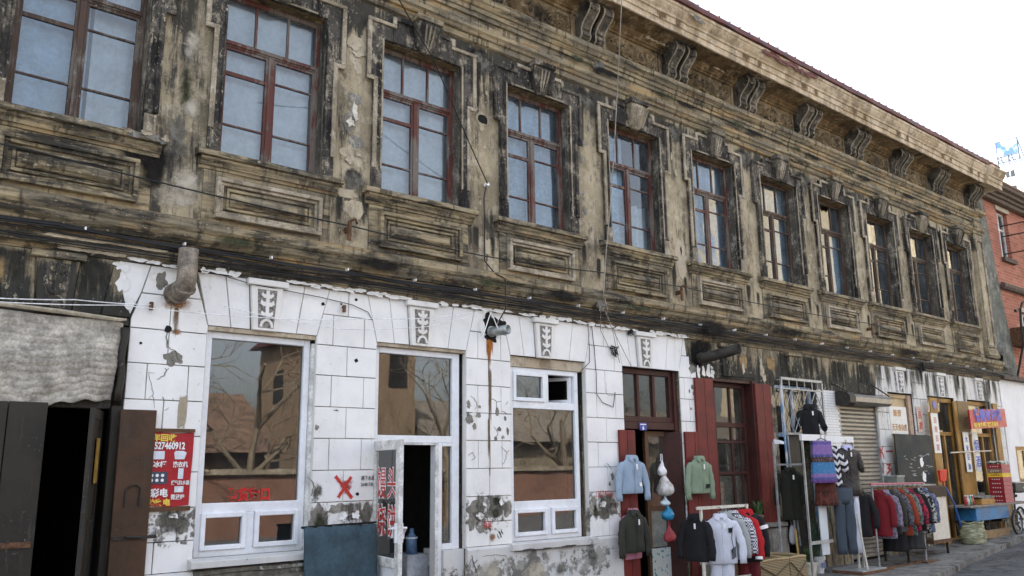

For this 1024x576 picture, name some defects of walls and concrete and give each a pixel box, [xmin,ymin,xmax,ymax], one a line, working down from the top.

water stain [122,70,198,206]
spalling [337,93,366,219]
water stain [337,170,367,216]
peeling [45,232,177,311]
peeling [201,267,242,278]
corrosion [166,302,187,334]
spalling [163,351,183,367]
water stain [858,365,891,389]
water stain [904,370,966,402]
water stain [983,380,997,409]
peeling [310,486,373,526]
peeling [155,511,191,537]